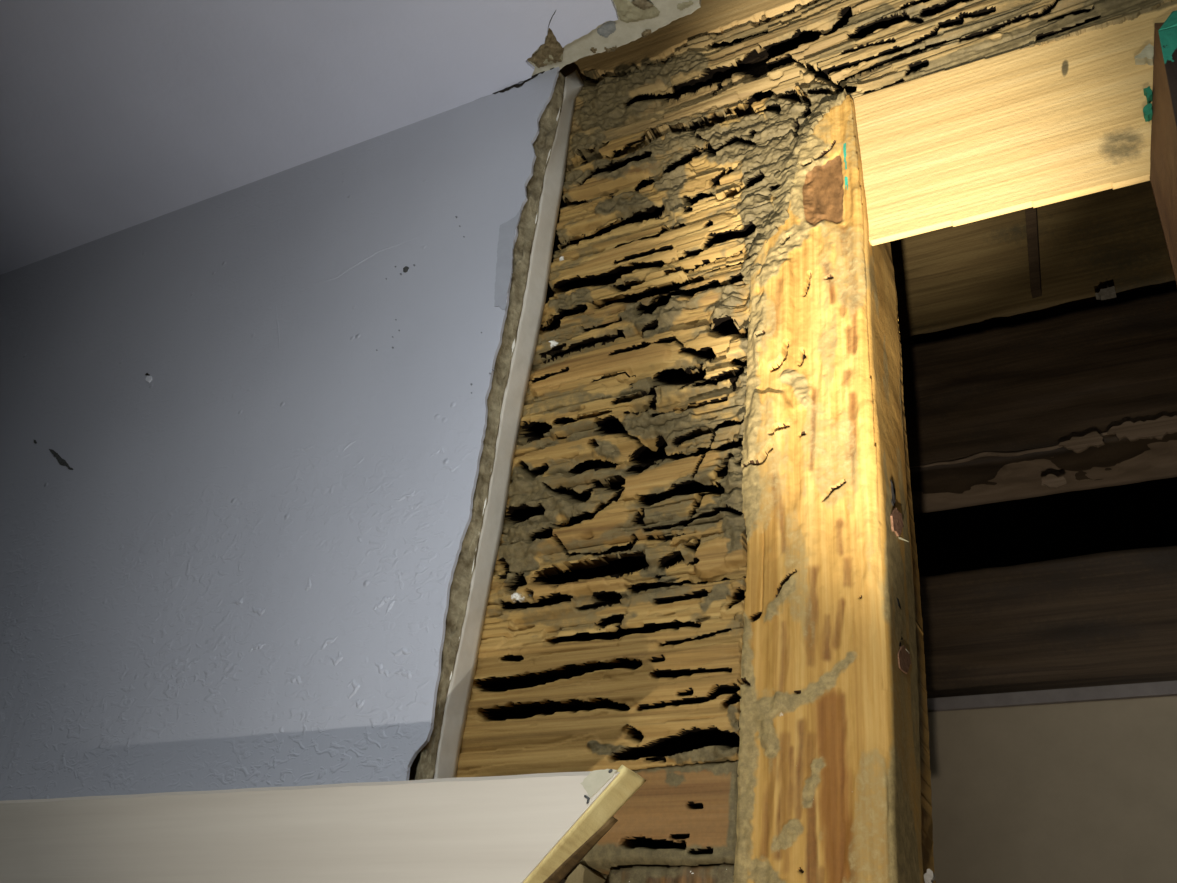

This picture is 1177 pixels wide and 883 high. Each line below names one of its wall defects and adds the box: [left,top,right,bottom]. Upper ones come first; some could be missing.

flaking render [614,0,660,38]
flaking render [527,28,564,68]
peeling [563,46,812,190]
peeling [494,209,522,311]
peeling [540,287,596,332]
spalling [637,292,687,316]
spalling [651,284,748,412]
spalling [519,410,681,475]
spalling [714,453,742,479]
peeling [554,494,589,520]
spalling [506,571,534,594]
peeling [639,549,746,613]